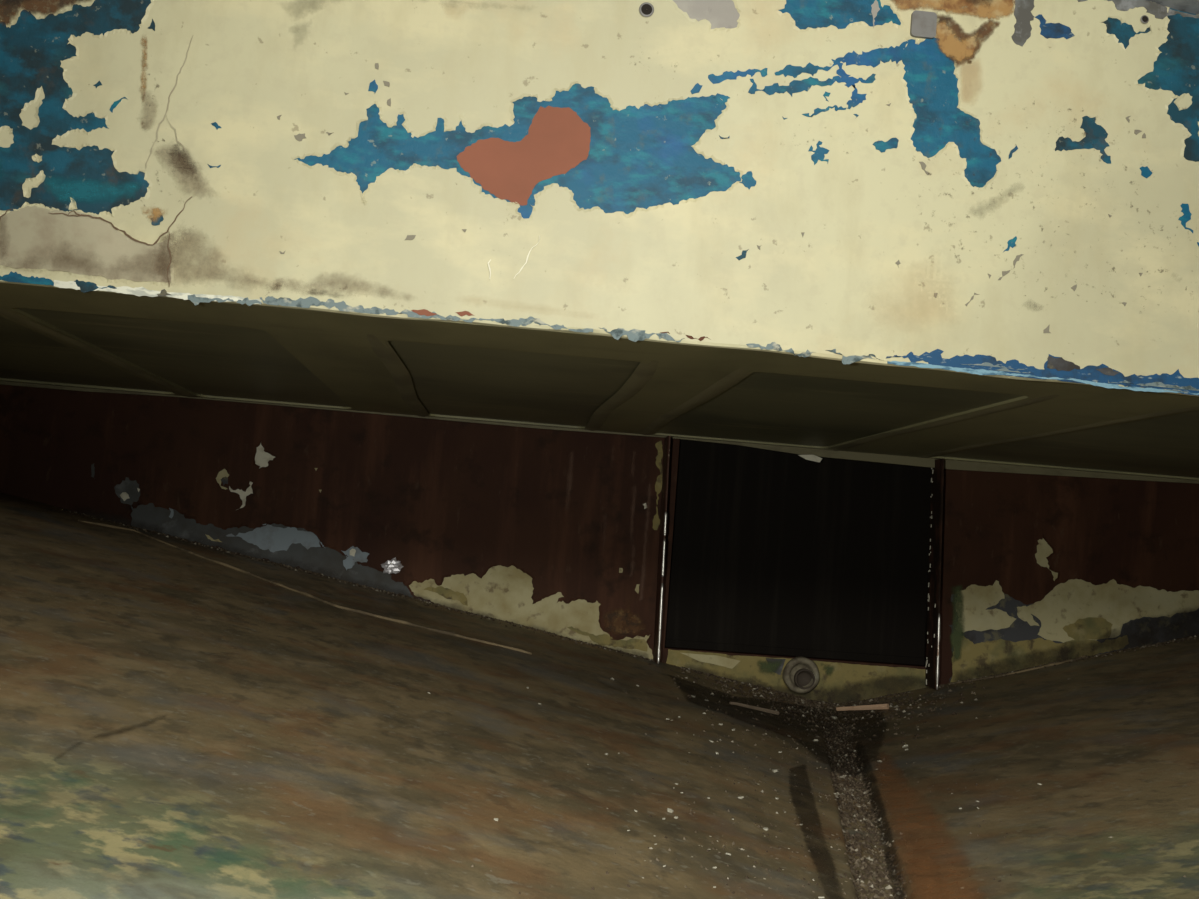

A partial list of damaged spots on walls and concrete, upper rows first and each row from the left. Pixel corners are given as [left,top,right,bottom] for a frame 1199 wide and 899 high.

peeling [0,0,155,217]
crack [146,36,193,168]
leakage [158,140,193,173]
peeling [291,0,1018,222]
corrosion [893,0,1014,66]
peeling [1055,116,1111,164]
peeling [1100,0,1199,162]
crack [50,197,192,285]
peeling [0,271,709,342]
peeling [746,342,1199,396]
peeling [114,440,928,702]
peeling [949,534,1199,683]